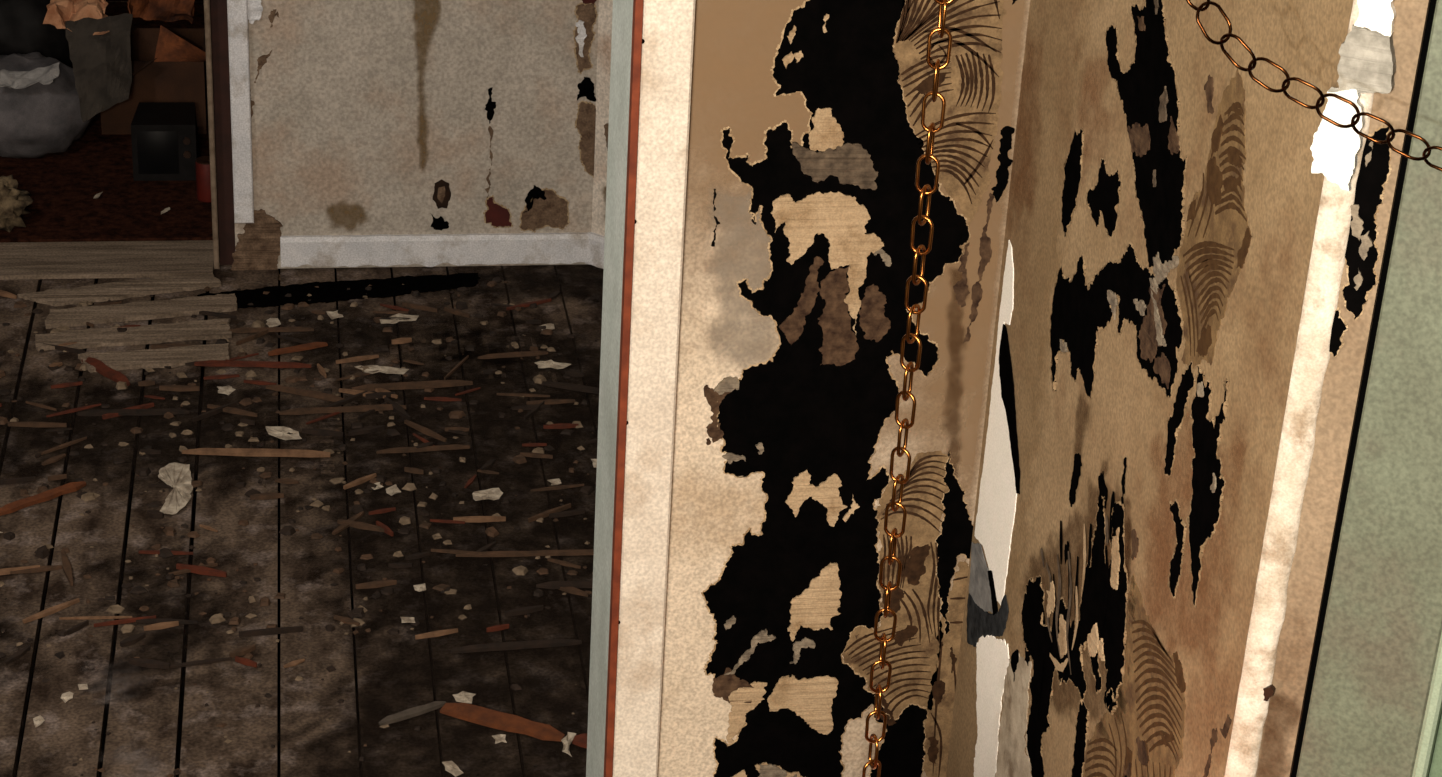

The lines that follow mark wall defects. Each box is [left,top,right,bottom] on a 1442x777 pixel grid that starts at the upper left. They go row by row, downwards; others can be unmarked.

leakage [414,0,440,169]
flaking render [573,0,598,178]
peeling [1310,0,1396,291]
peeling [771,107,892,366]
peeling [1107,252,1179,389]
peeling [704,376,764,464]
peeling [712,563,842,745]
peeling [785,470,860,527]
flaking render [966,240,1032,777]
peeling [1087,623,1105,661]
peeling [1110,527,1121,590]
peeling [733,762,803,777]